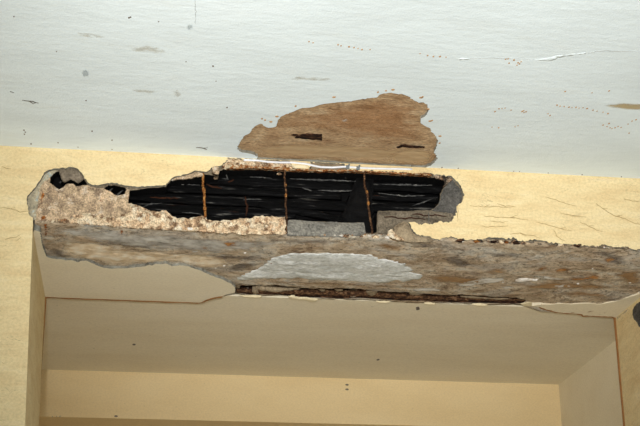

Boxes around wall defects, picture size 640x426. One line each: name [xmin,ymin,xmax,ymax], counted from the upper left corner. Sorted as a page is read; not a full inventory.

peeling [238,89,442,165]
rust [222,164,432,178]
spalling [27,169,640,313]
crack [457,197,603,241]